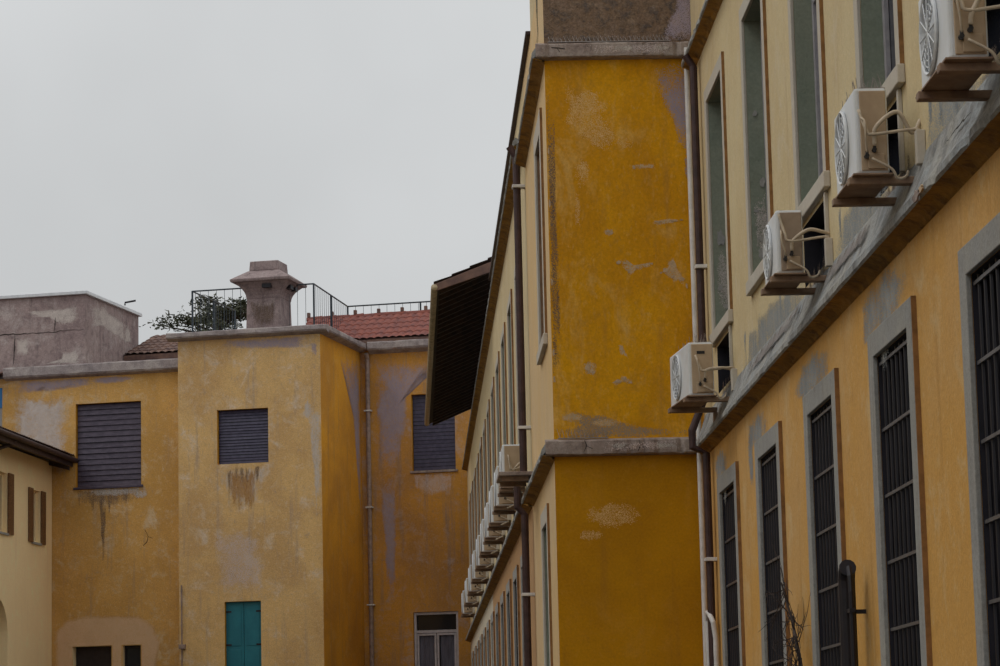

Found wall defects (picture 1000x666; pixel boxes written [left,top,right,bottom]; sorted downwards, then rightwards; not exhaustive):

damp [78,487,147,560]